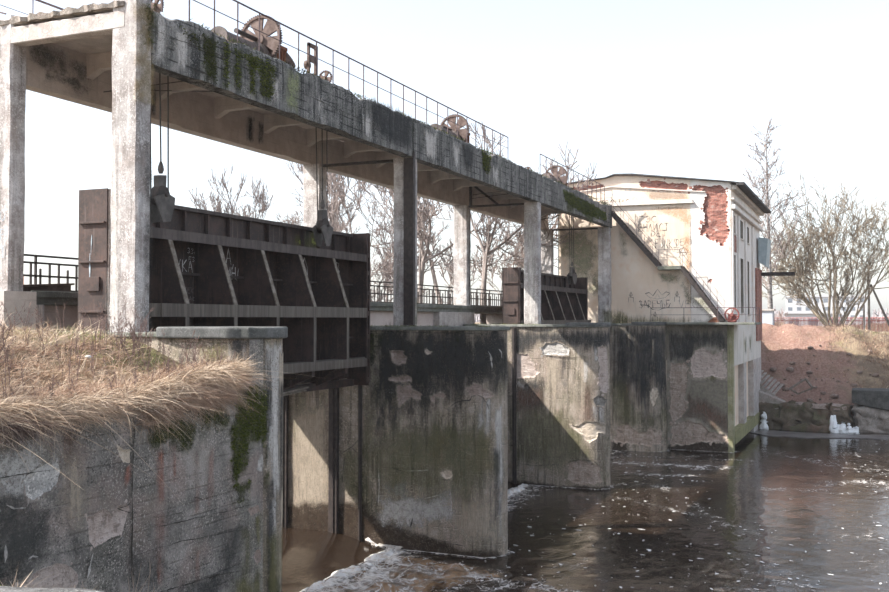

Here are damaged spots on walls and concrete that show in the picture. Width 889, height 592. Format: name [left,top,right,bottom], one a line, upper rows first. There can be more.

flaking render [639,178,730,246]
peeling [388,350,445,409]
peeling [569,346,729,448]
peeling [23,458,60,500]
water stain [0,432,83,585]
spalling [84,499,129,551]
crack [108,418,266,580]
water stain [257,313,728,592]
crack [160,567,258,592]